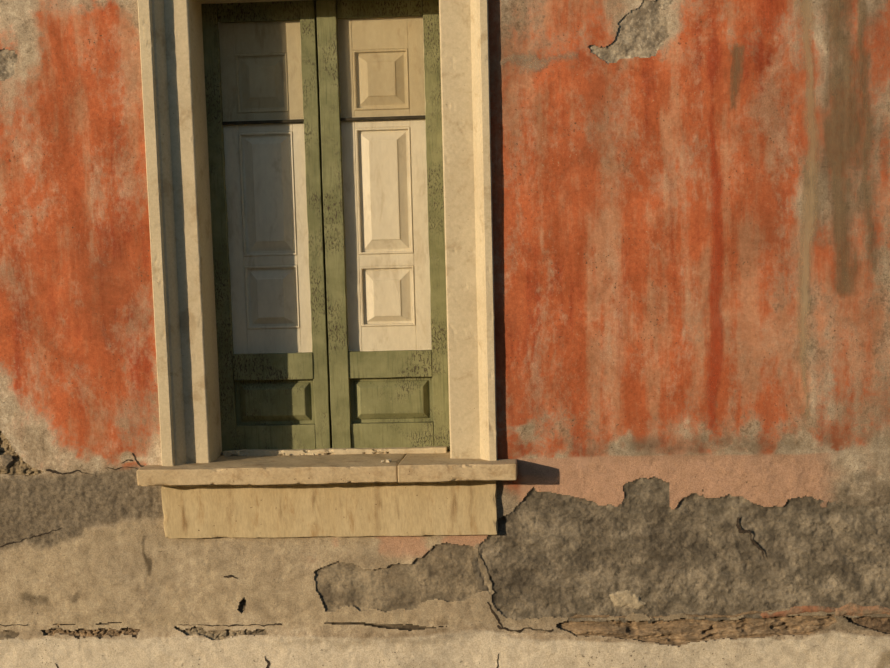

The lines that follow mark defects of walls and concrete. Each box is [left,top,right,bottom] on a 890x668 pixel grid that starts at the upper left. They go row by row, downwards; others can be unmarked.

peeling [588,0,673,64]
peeling [0,48,18,81]
water stain [800,0,870,385]
flaking render [0,431,44,476]
flaking render [314,476,890,647]
crack [180,621,282,629]
crack [324,622,447,631]
crack [487,602,553,633]